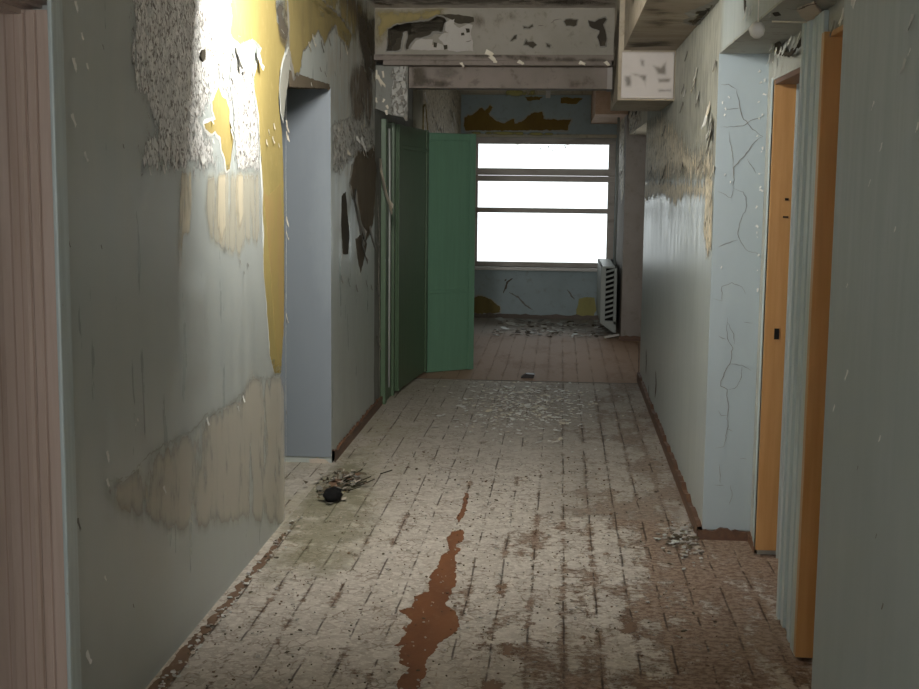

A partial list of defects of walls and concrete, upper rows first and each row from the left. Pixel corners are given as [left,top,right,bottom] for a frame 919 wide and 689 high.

peeling [130,0,352,375]
peeling [332,64,408,320]
spalling [386,14,474,67]
peeling [422,90,573,133]
spalling [563,16,608,48]
peeling [619,67,714,258]
crack [719,84,763,254]
peeling [474,294,502,314]
crack [713,282,750,503]
peeling [148,533,286,689]
peeling [394,492,469,689]
peeling [476,613,537,664]